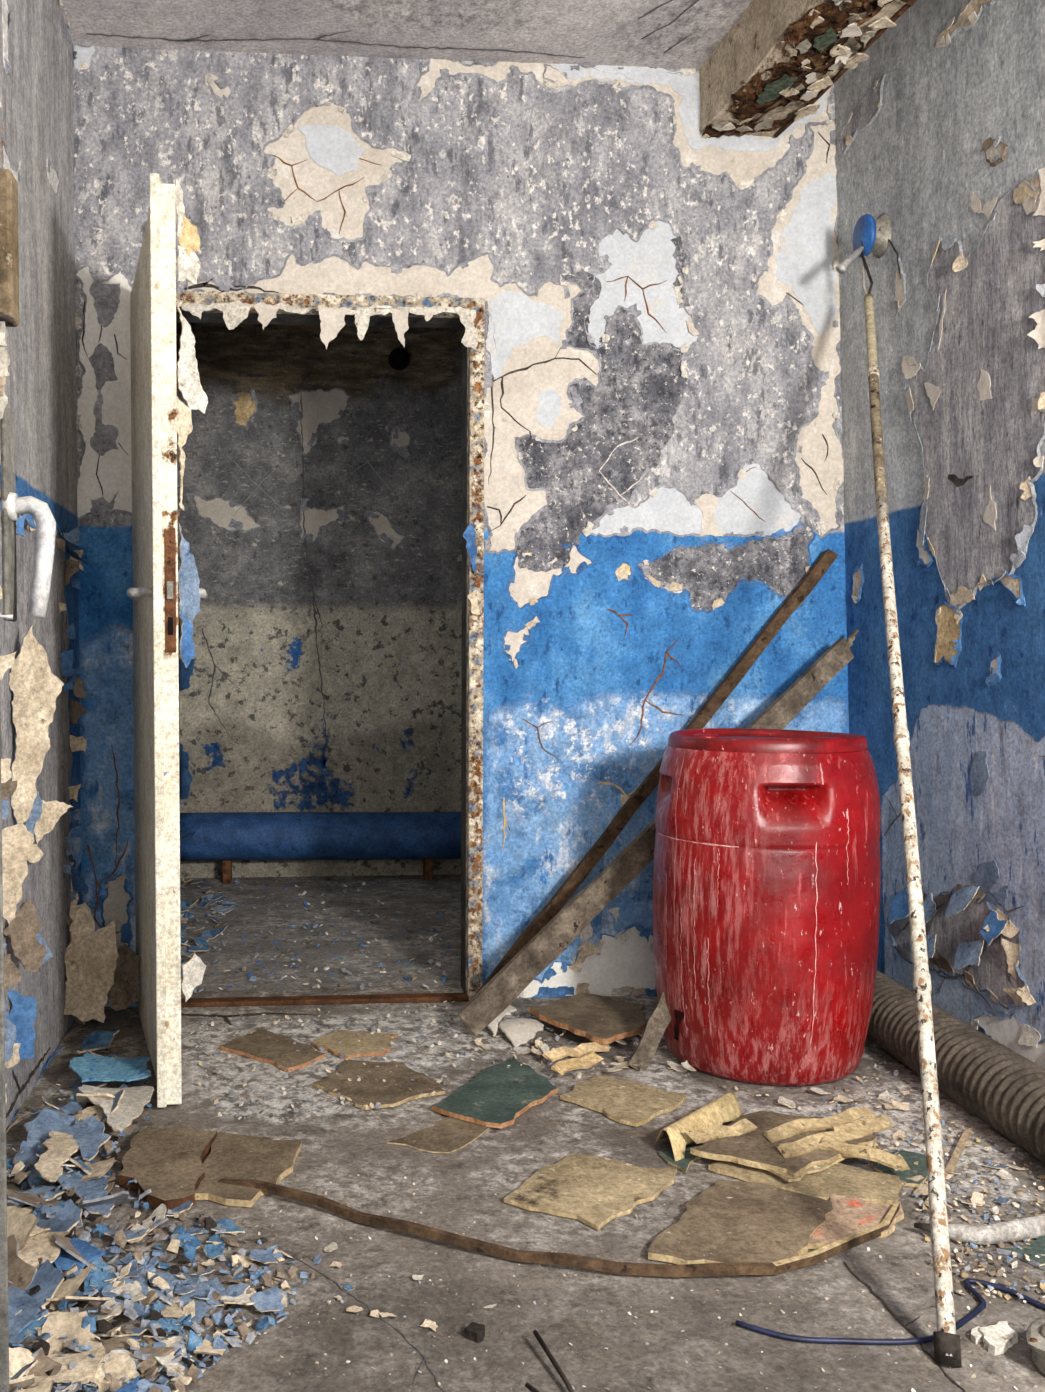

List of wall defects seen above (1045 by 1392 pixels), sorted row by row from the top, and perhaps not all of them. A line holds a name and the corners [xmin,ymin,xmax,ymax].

peeling [933,0,996,48]
corrosion [454,302,486,399]
peeling [172,0,917,690]
peeling [901,167,1045,667]
corrosion [470,451,484,626]
peeling [0,265,141,1133]
peeling [179,742,193,805]
peeling [985,654,1002,689]
corrosion [469,743,483,993]
peeling [181,953,206,1002]
peeling [886,884,1045,1068]
peeling [34,1085,154,1218]